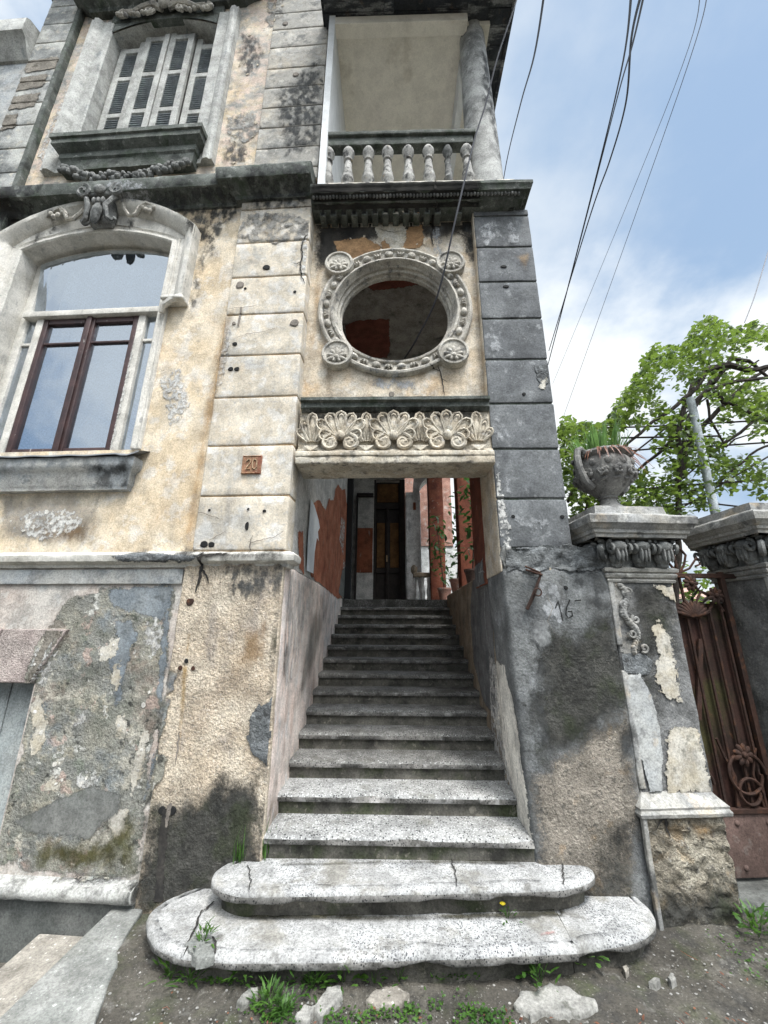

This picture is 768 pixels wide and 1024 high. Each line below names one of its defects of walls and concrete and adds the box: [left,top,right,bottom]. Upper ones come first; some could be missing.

damp [246,62,323,210]
peeling [333,211,426,259]
crack [195,512,283,592]
peeling [284,485,373,683]
peeling [0,583,195,883]
spalling [246,697,272,766]
peeling [470,560,711,897]
damp [127,777,264,913]
crack [184,901,217,954]